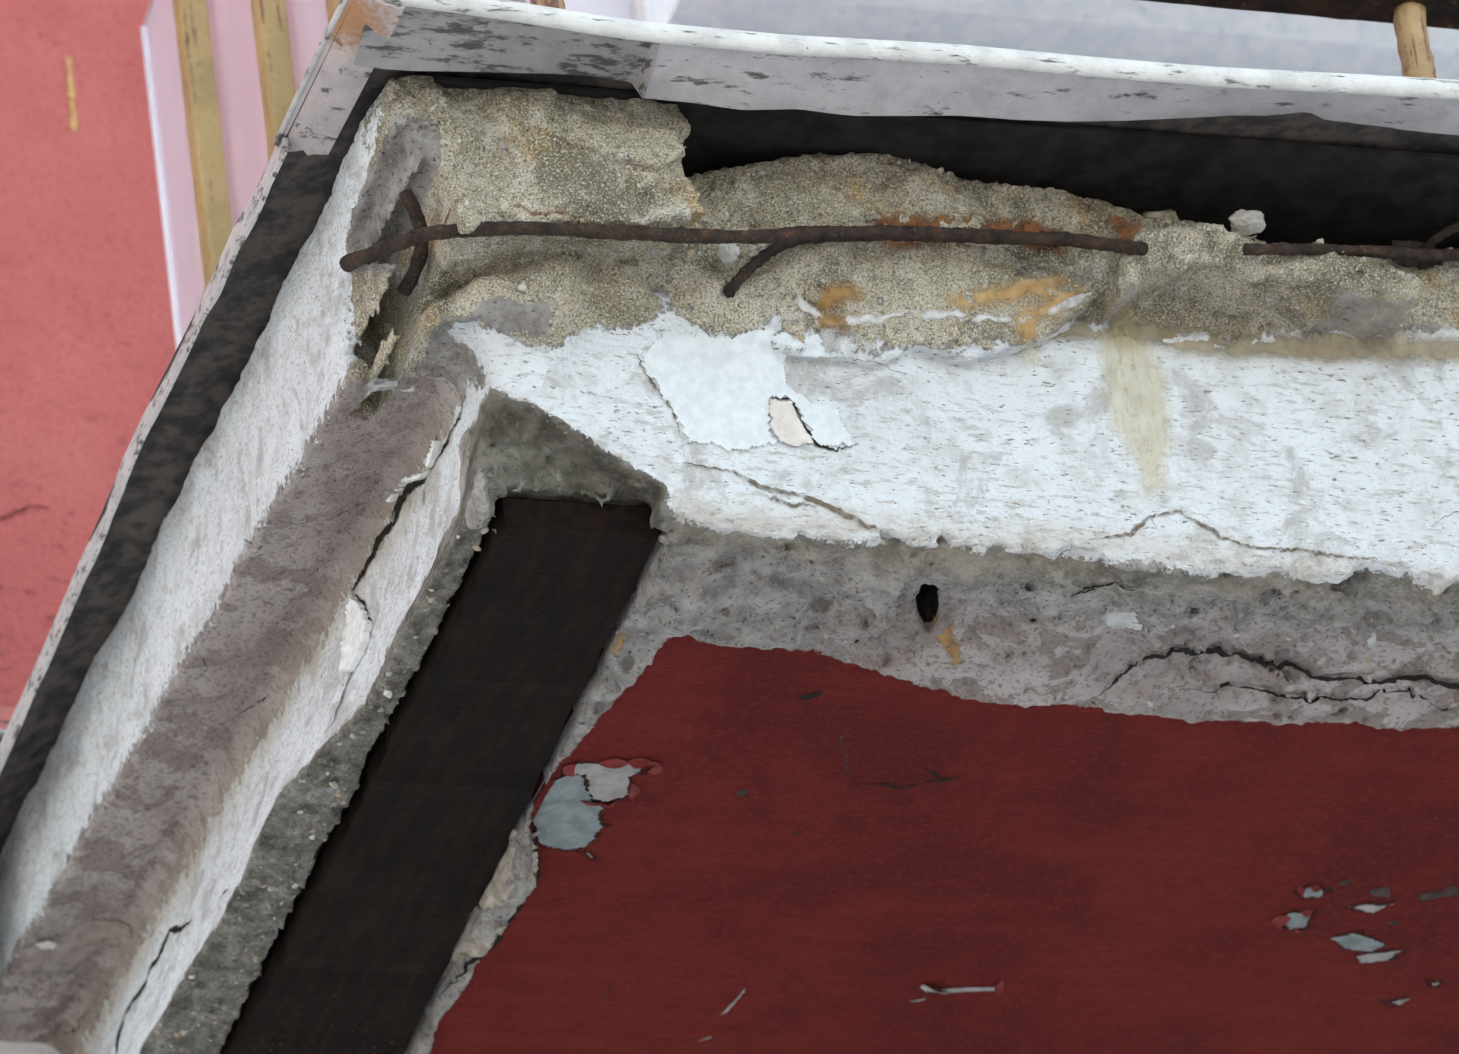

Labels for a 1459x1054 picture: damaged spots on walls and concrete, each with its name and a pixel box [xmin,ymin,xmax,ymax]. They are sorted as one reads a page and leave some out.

corrosion [516,205,589,224]
spalling [311,75,1459,459]
corrosion [874,213,1064,254]
damp [797,295,1010,331]
corrosion [952,276,1075,339]
damp [1014,292,1459,361]
crack [637,355,894,539]
crack [244,397,462,621]
spalling [589,541,1459,731]
crack [1092,646,1459,711]
spalling [139,388,669,1054]
peeling [1330,932,1402,963]